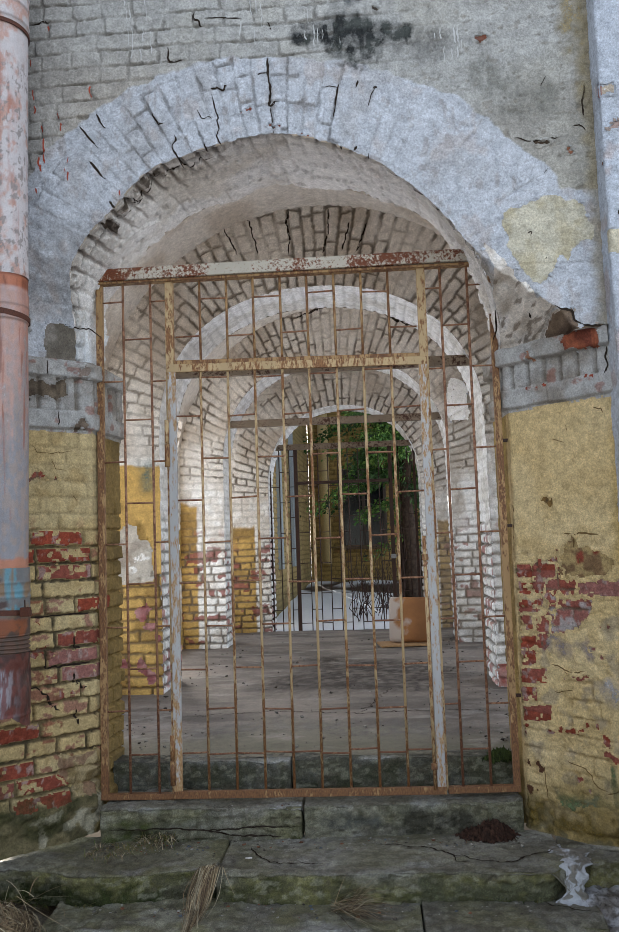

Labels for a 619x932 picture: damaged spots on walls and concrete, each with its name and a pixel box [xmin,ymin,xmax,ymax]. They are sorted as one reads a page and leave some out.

water stain [292,12,462,68]
crack [258,58,276,133]
crack [79,114,106,179]
crack [109,85,226,217]
crack [224,220,258,255]
crack [284,211,292,254]
crack [323,209,366,252]
peeling [481,195,608,365]
peeling [28,531,91,581]
peeling [30,629,100,704]
peeling [497,661,508,687]
peeling [514,534,619,768]